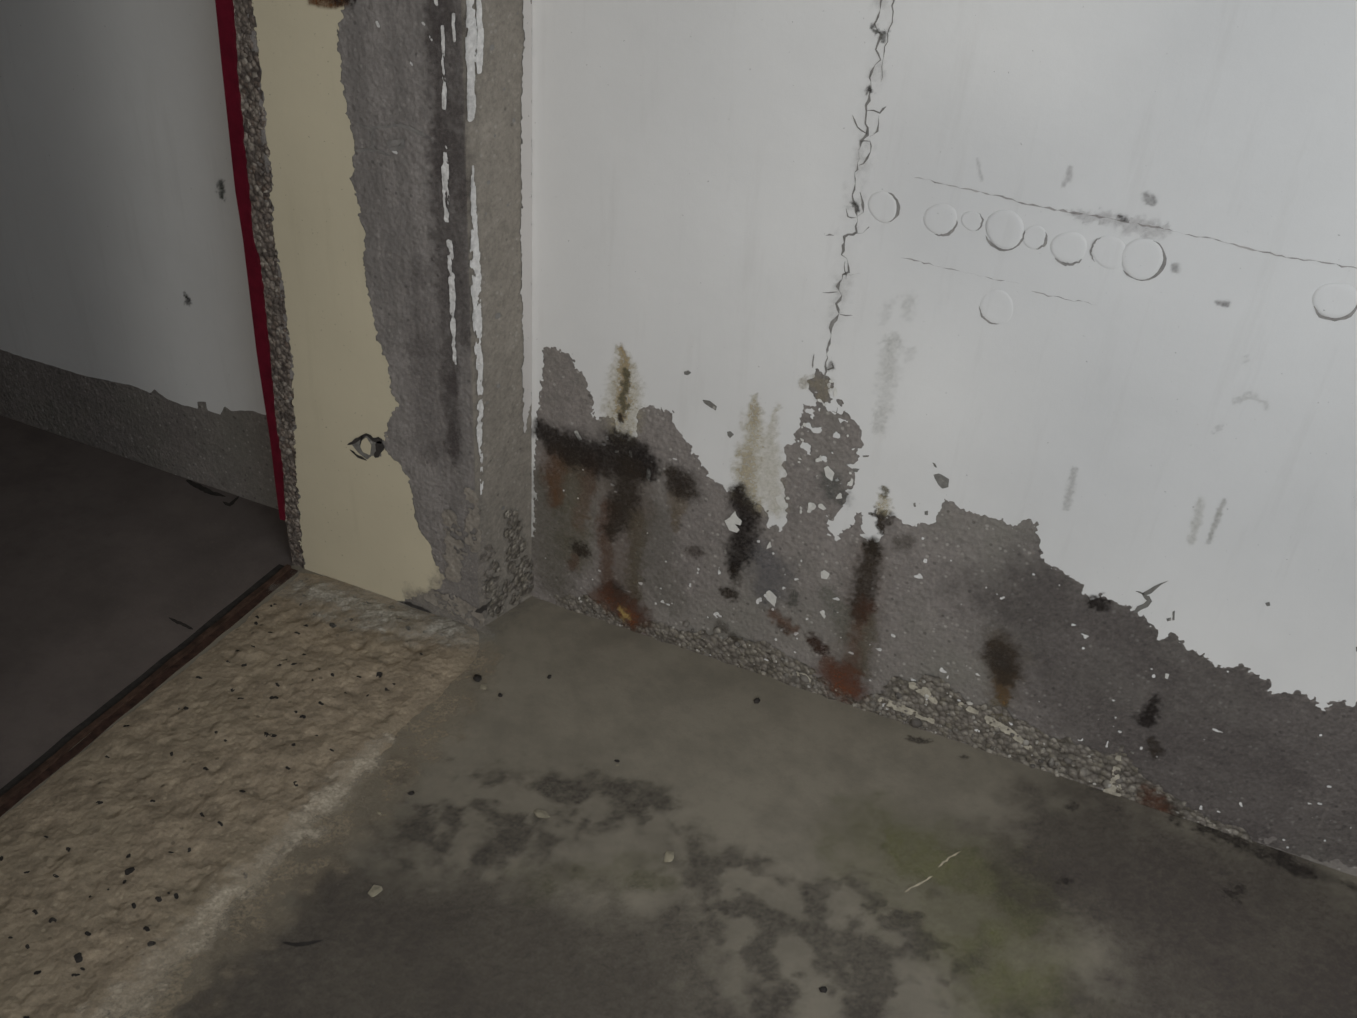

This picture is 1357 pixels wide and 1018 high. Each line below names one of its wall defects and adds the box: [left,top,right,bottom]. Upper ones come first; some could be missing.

rust [309,0,356,8]
crack [812,0,895,413]
rust [533,347,699,630]
peeling [337,0,1357,877]
rust [847,486,894,649]
rust [771,611,861,698]
rust [983,637,1021,706]
spalling [71,952,85,977]
water stain [169,850,732,1018]